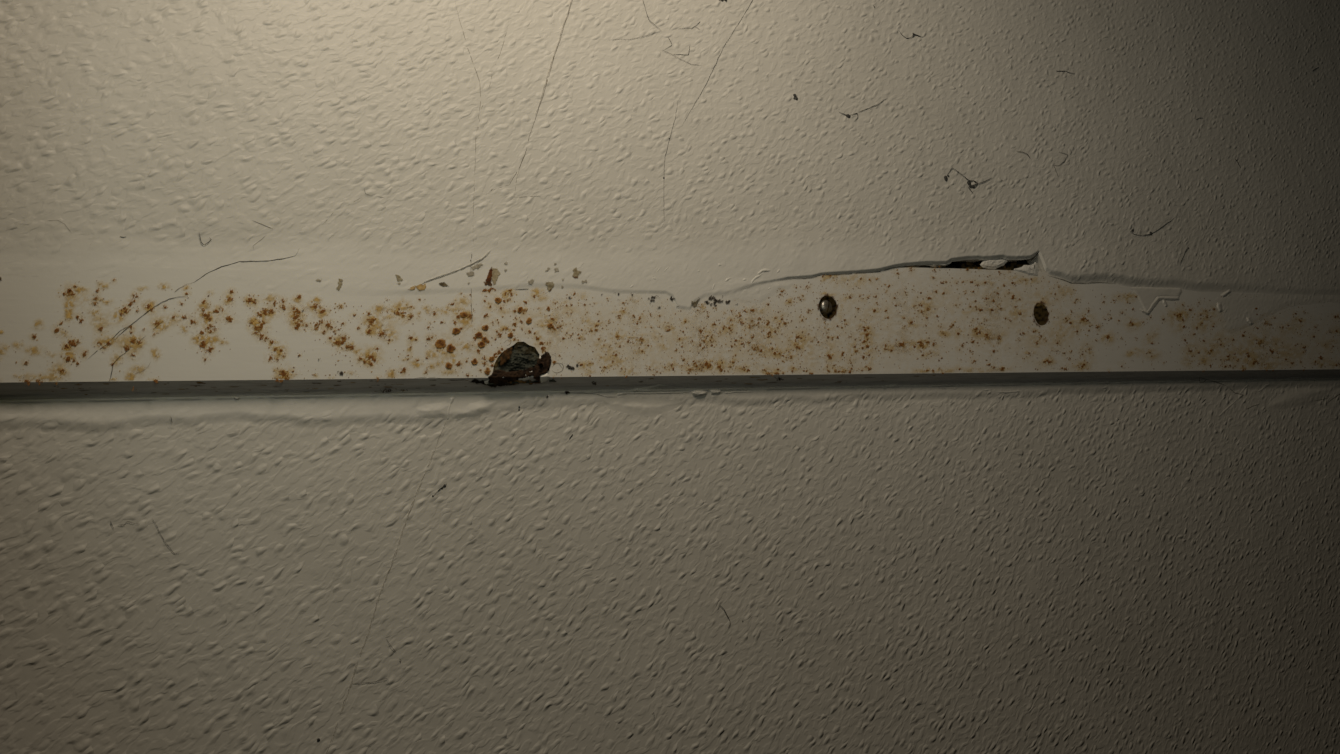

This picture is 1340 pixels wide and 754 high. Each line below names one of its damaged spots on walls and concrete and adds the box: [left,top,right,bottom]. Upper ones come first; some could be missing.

rust [0,266,1340,395]
flaking render [980,259,1039,276]